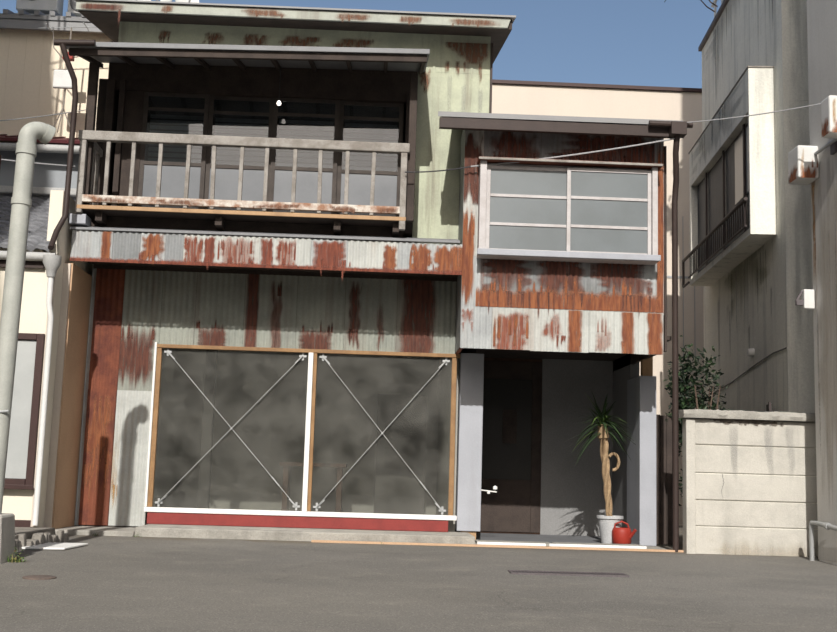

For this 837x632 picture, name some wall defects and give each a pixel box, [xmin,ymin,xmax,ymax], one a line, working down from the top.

rust [452,19,494,27]
rust [245,35,265,45]
rust [282,36,319,46]
rust [335,39,373,48]
rust [446,42,488,79]
rust [70,132,664,355]
rust [84,398,117,499]